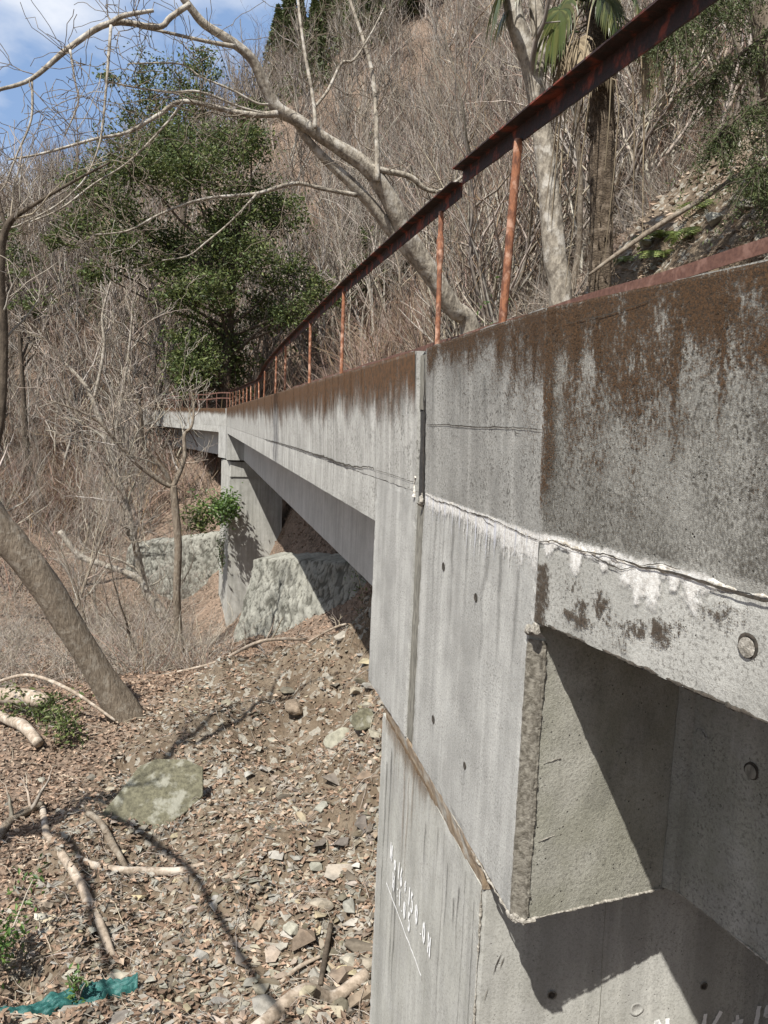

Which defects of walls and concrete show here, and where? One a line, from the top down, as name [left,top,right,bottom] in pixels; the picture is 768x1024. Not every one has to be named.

crack [430,424,542,434]
crack [265,439,768,730]
damp [425,309,768,627]
crack [435,883,474,1024]